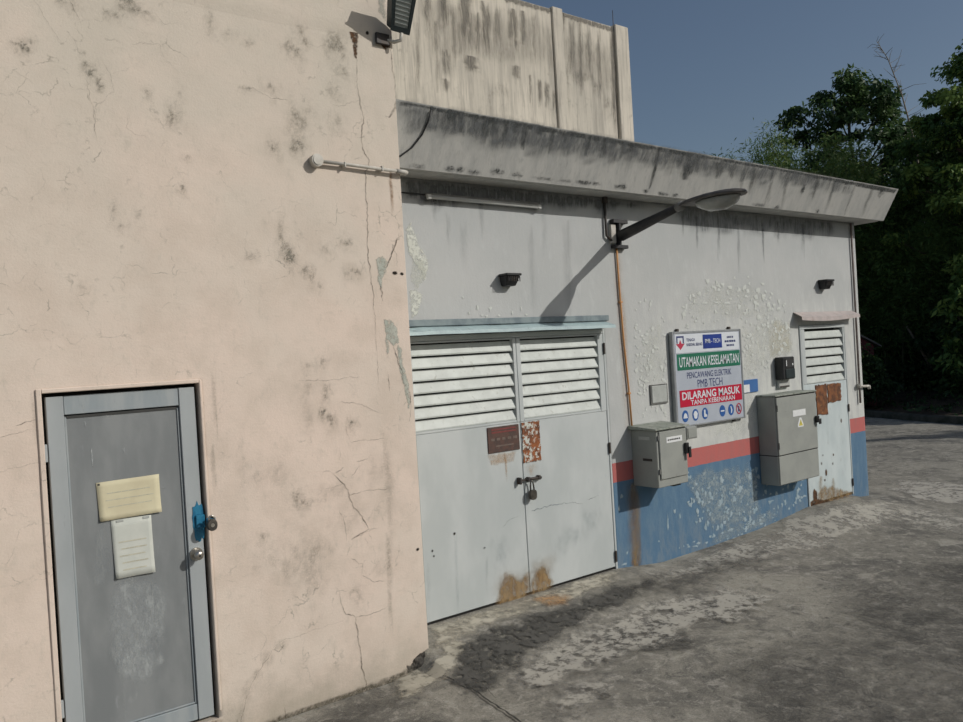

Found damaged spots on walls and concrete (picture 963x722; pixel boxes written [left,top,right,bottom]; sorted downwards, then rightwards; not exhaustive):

damp [461,0,490,41]
damp [506,0,616,114]
damp [404,102,896,196]
damp [406,181,635,209]
peeling [376,223,428,317]
peeling [384,320,411,408]
peeling [679,467,806,549]
rust [819,487,852,501]
rust [499,567,566,604]
damp [452,562,774,722]